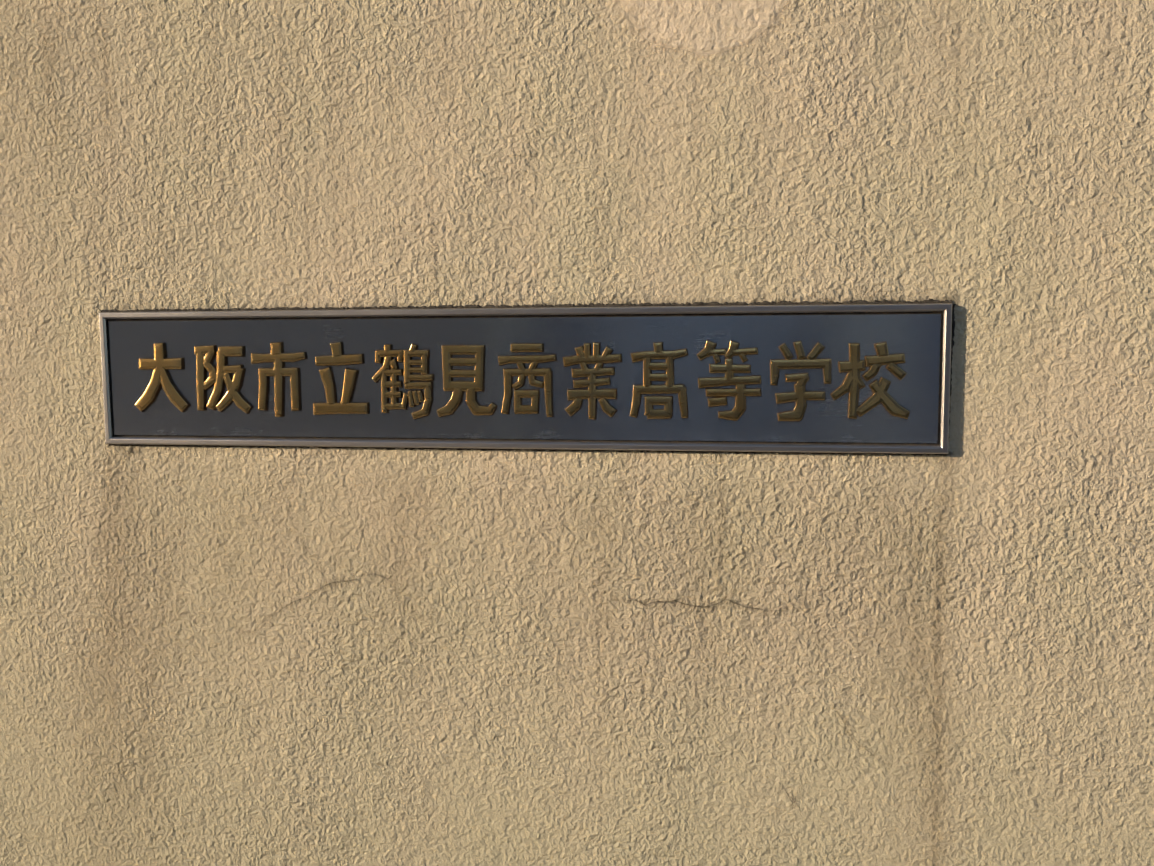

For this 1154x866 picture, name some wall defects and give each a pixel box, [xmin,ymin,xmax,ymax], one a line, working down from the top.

crack [246,525,414,632]
crack [624,457,826,667]